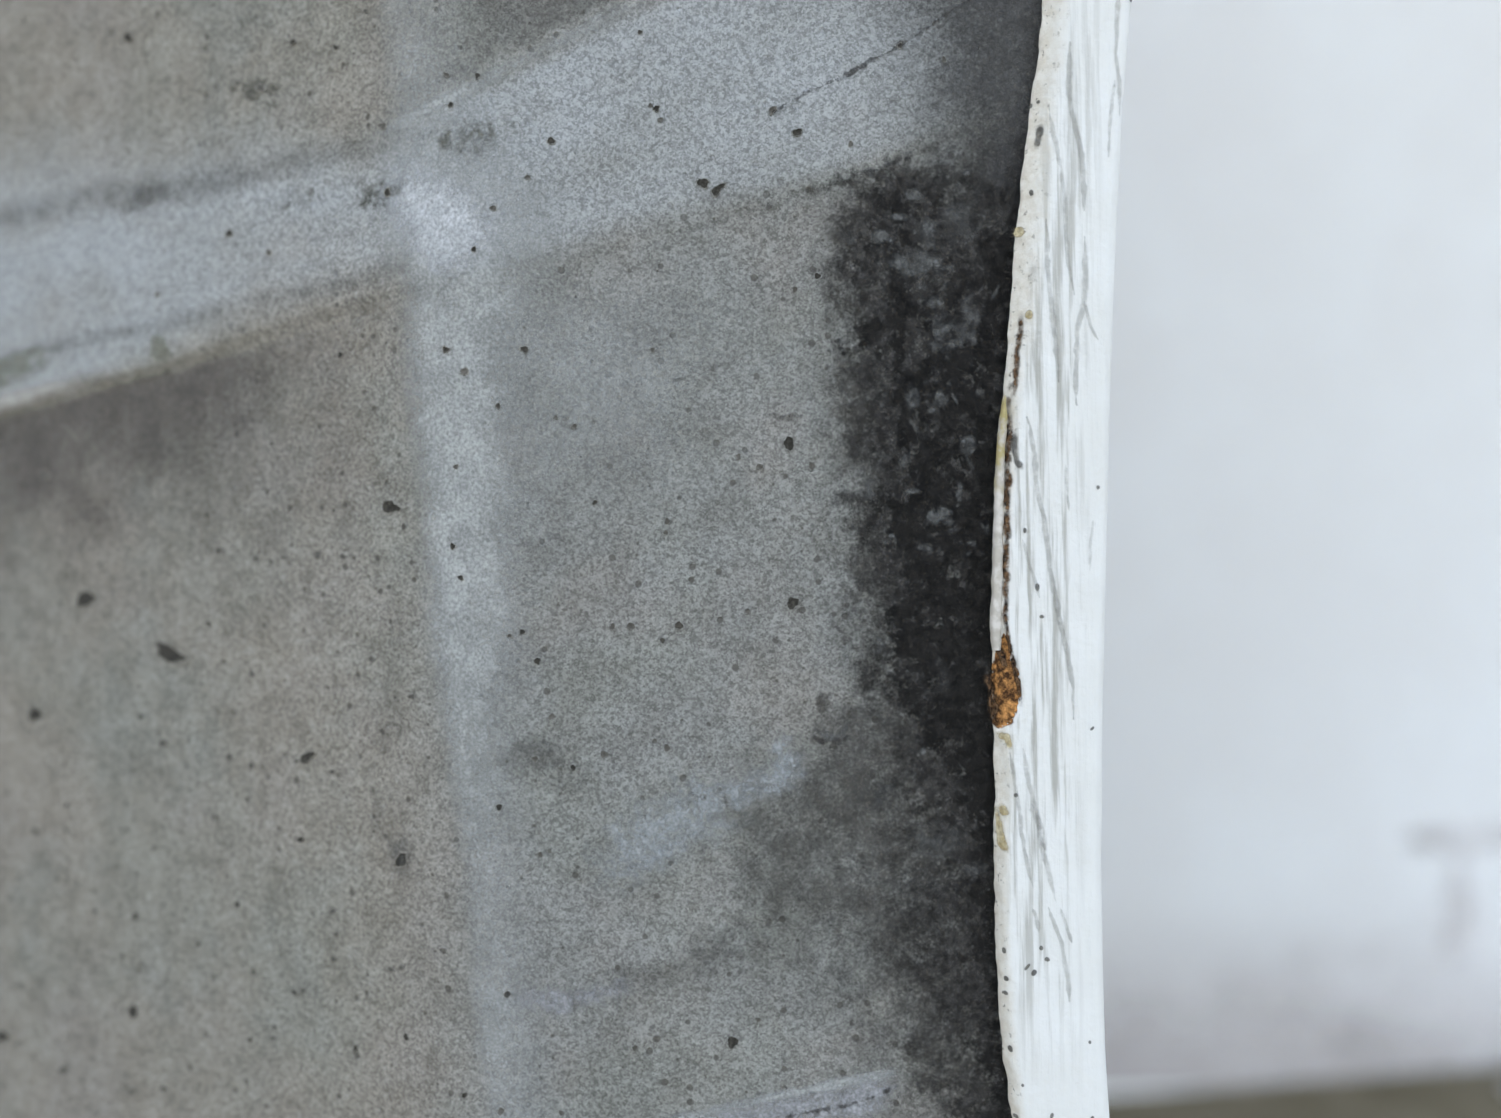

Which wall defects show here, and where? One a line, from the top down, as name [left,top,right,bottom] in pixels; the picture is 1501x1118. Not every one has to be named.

damp [787,0,1042,1118]
rust [985,319,1023,729]